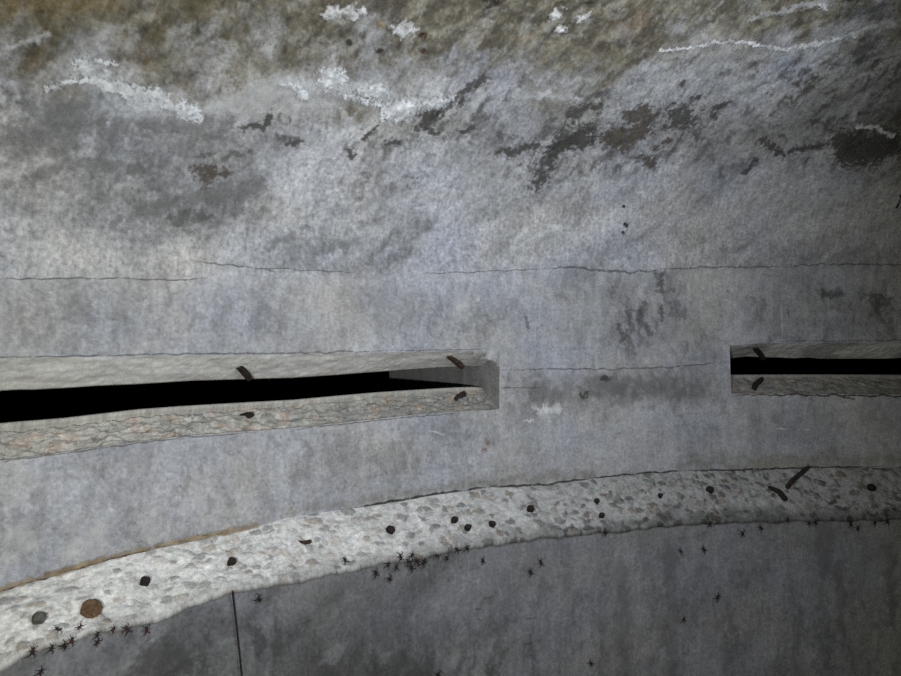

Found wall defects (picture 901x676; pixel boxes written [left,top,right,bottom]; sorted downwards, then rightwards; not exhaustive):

damp [658,0,899,62]
damp [189,151,251,189]
damp [44,53,494,160]
damp [494,88,732,192]
damp [755,94,901,171]